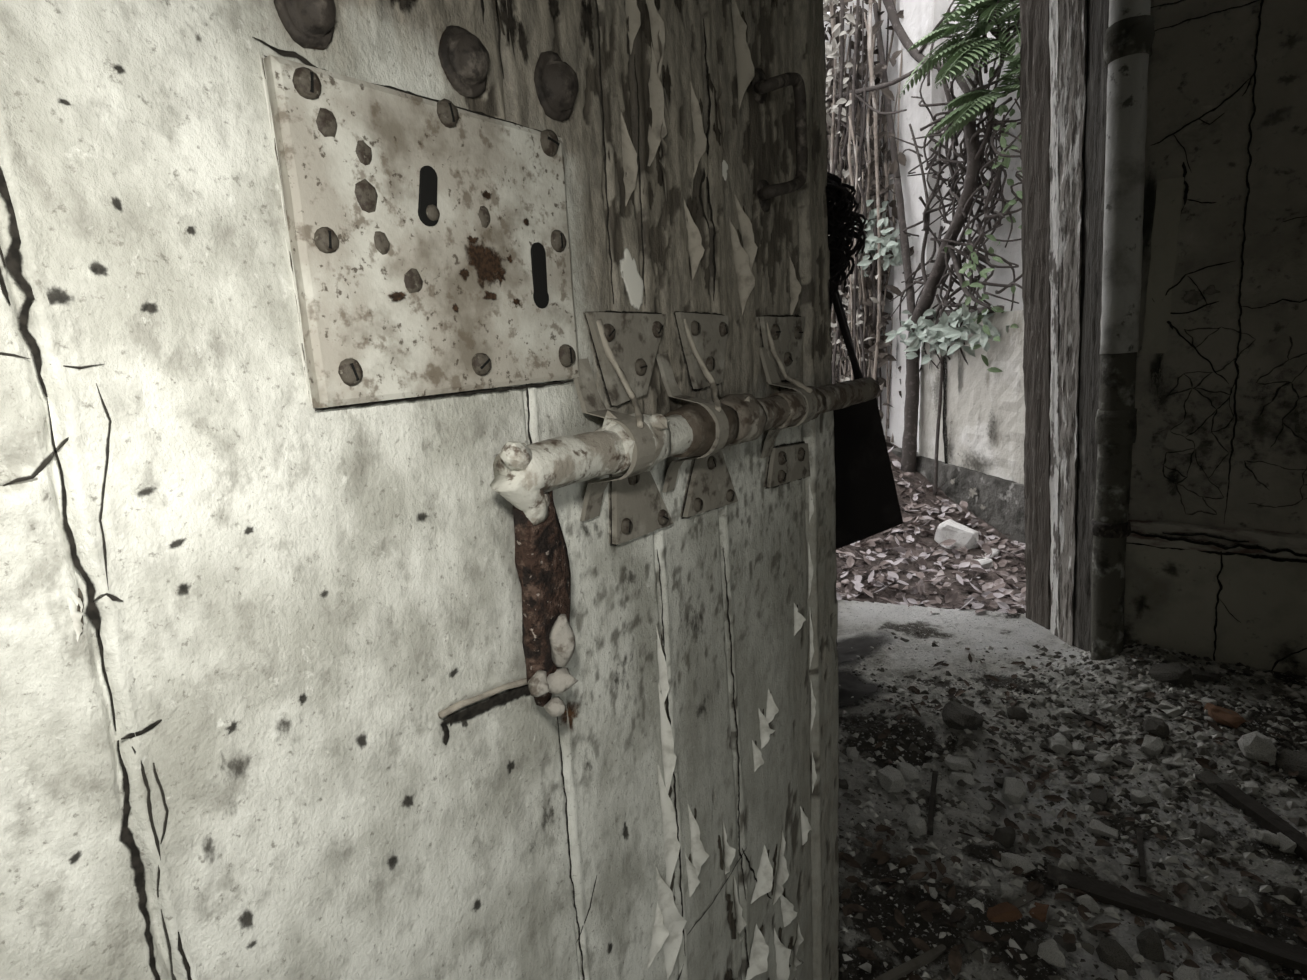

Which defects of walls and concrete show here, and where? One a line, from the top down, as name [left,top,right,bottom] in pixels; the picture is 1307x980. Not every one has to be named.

peeling [500,0,528,61]
peeling [608,0,686,210]
peeling [691,0,754,181]
corrosion [388,292,406,301]
corrosion [459,236,513,300]
peeling [620,248,644,310]
peeling [684,196,704,279]
peeling [729,195,758,315]
crack [1126,0,1307,661]
crack [0,166,192,980]
peeling [794,542,814,667]
peeling [647,625,804,980]